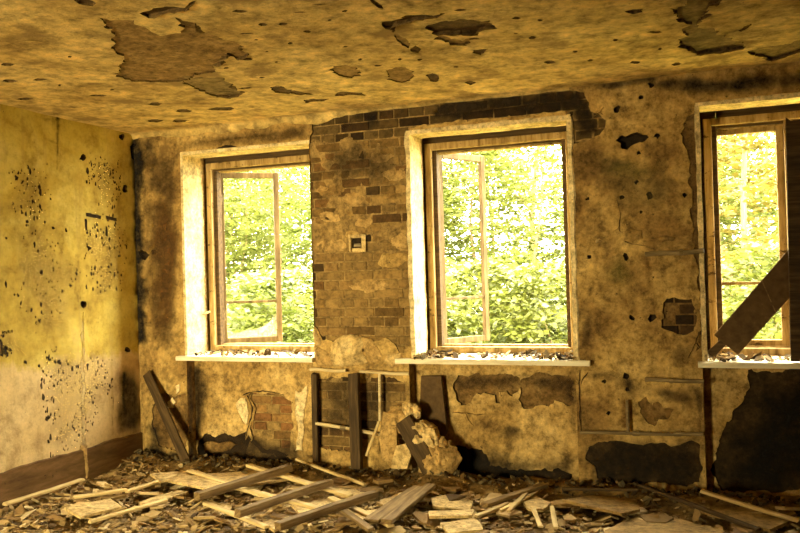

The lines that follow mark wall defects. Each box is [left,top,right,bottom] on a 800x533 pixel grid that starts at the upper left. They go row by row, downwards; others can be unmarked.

peeling [103,1,249,109]
peeling [382,13,497,51]
peeling [674,0,800,61]
hole [617,133,660,155]
damp [130,139,172,342]
flaking render [310,90,606,353]
flaking render [648,114,707,350]
damp [118,373,140,428]
flaking render [152,384,308,463]
spalling [454,372,574,409]
spalling [586,369,800,493]